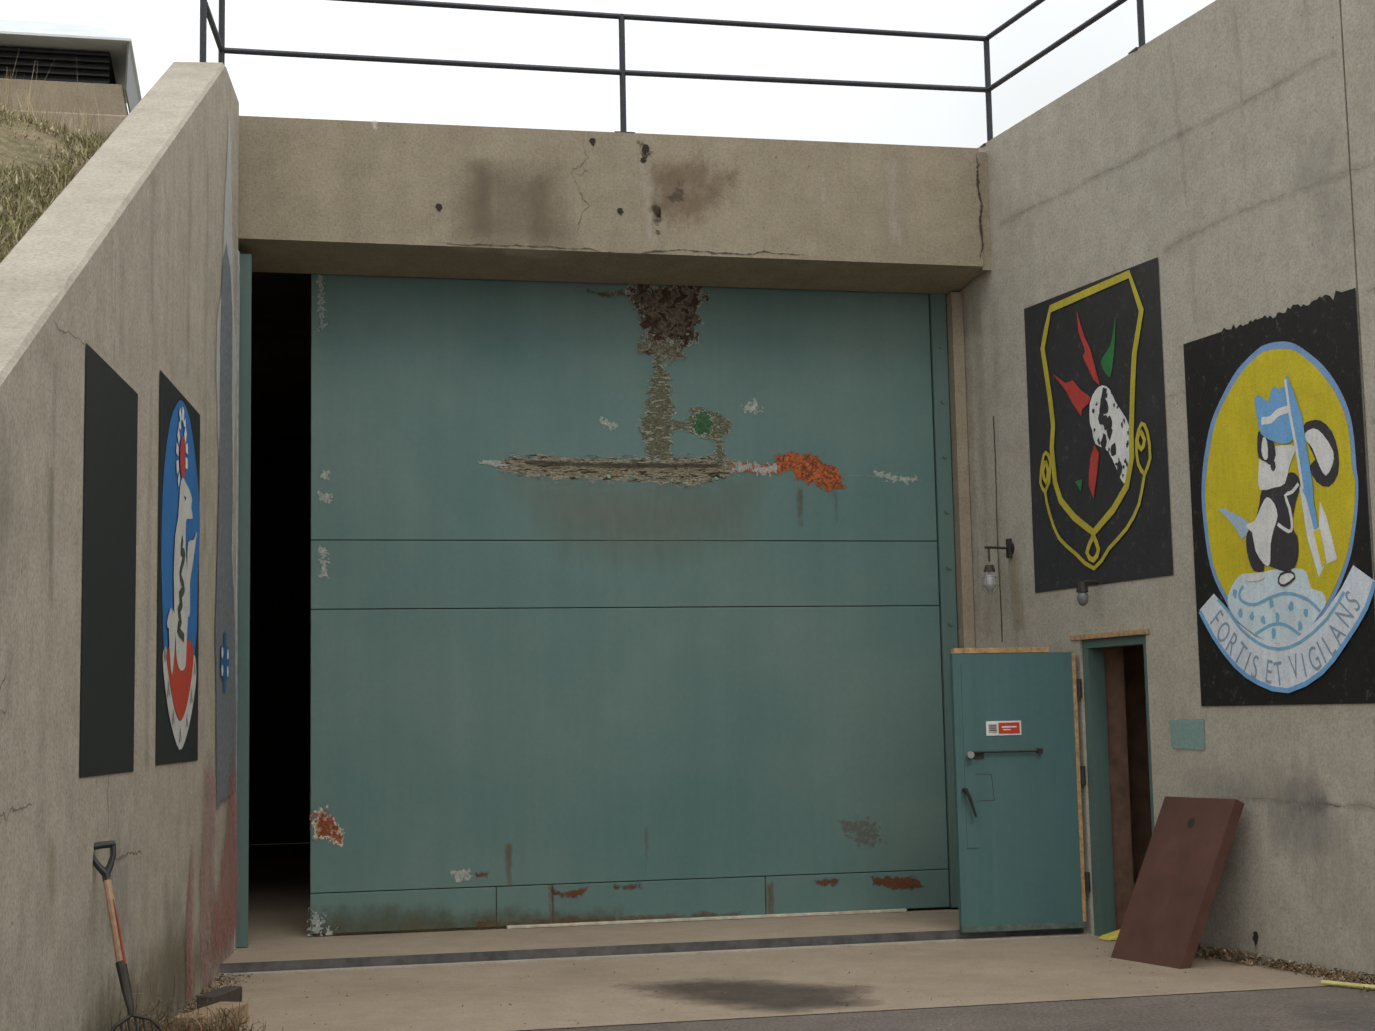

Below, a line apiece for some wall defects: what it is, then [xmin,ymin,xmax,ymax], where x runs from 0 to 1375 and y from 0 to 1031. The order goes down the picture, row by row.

crack [447,153,801,255]
crack [976,154,984,257]
peeling [478,284,764,488]
corrosion [732,451,846,492]
corrosion [551,888,586,898]
corrosion [872,876,921,890]
corrosion [473,916,675,928]